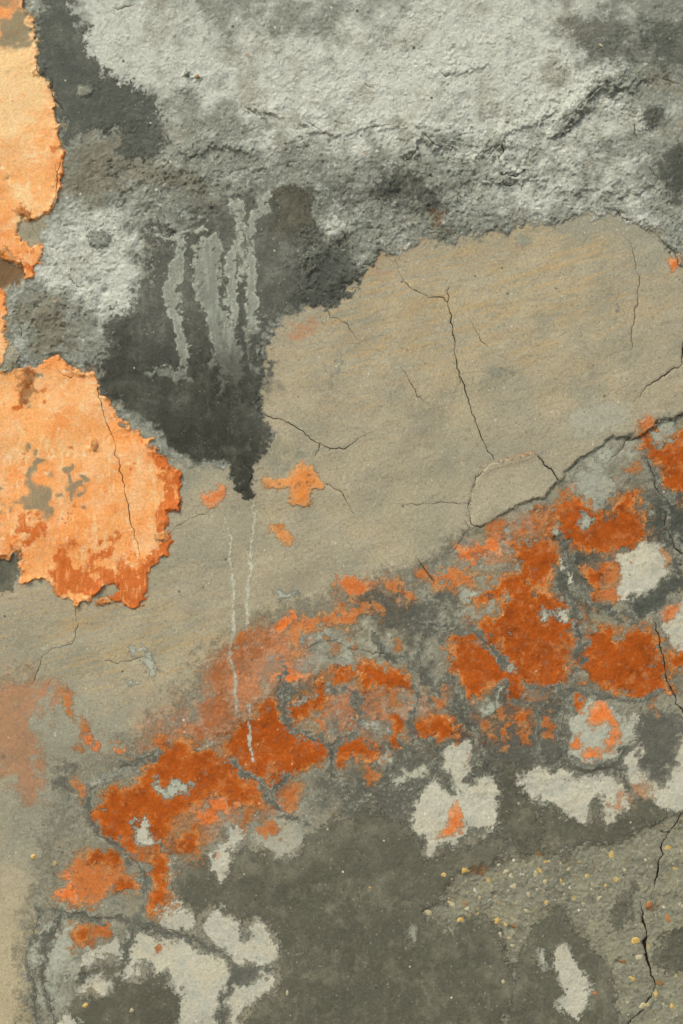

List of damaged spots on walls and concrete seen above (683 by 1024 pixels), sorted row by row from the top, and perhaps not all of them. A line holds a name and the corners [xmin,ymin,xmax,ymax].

flaking render [0,0,683,609]
crack [623,233,640,360]
crack [97,387,140,567]
leakage [84,184,361,762]
crack [264,414,358,455]
crack [396,262,683,560]
flaking render [12,412,683,1024]
leakage [171,677,668,1024]
crack [628,813,683,1024]
leakage [635,705,683,785]
leakage [650,927,683,975]